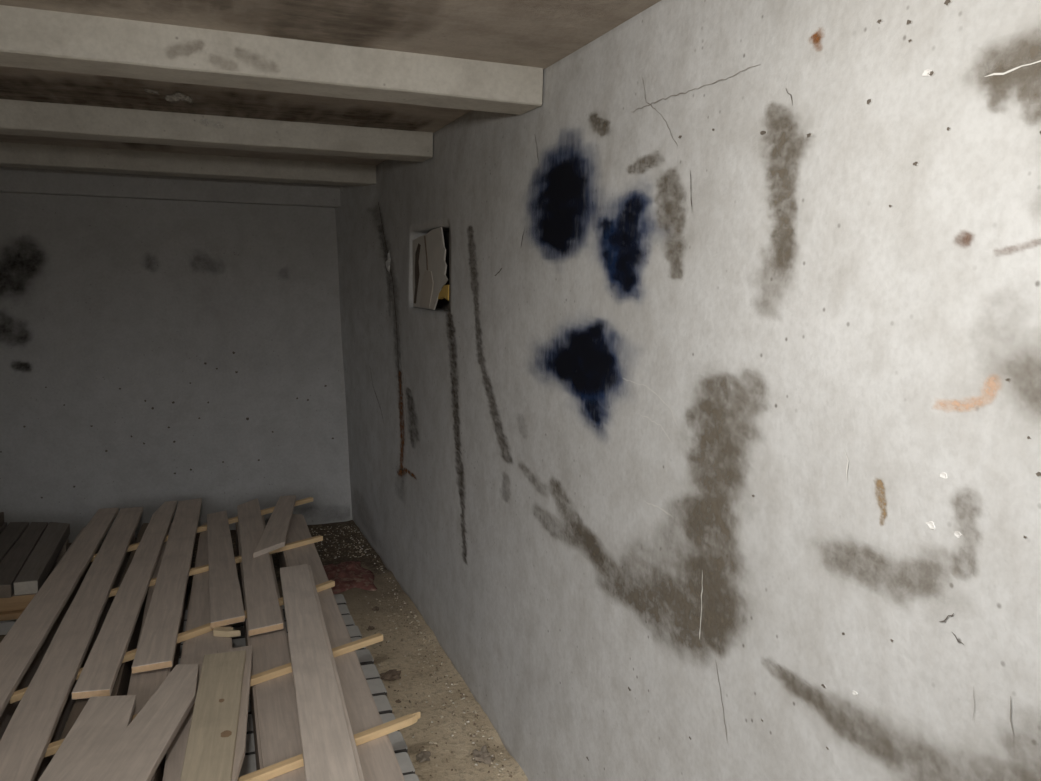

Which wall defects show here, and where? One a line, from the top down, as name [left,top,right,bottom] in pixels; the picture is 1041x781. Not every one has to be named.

leakage [987,41,1041,119]
leakage [0,242,43,295]
leakage [598,219,617,271]
leakage [629,156,655,173]
leakage [659,171,683,278]
leakage [768,110,802,268]
leakage [468,227,523,468]
rust [398,371,416,479]
leakage [448,315,467,562]